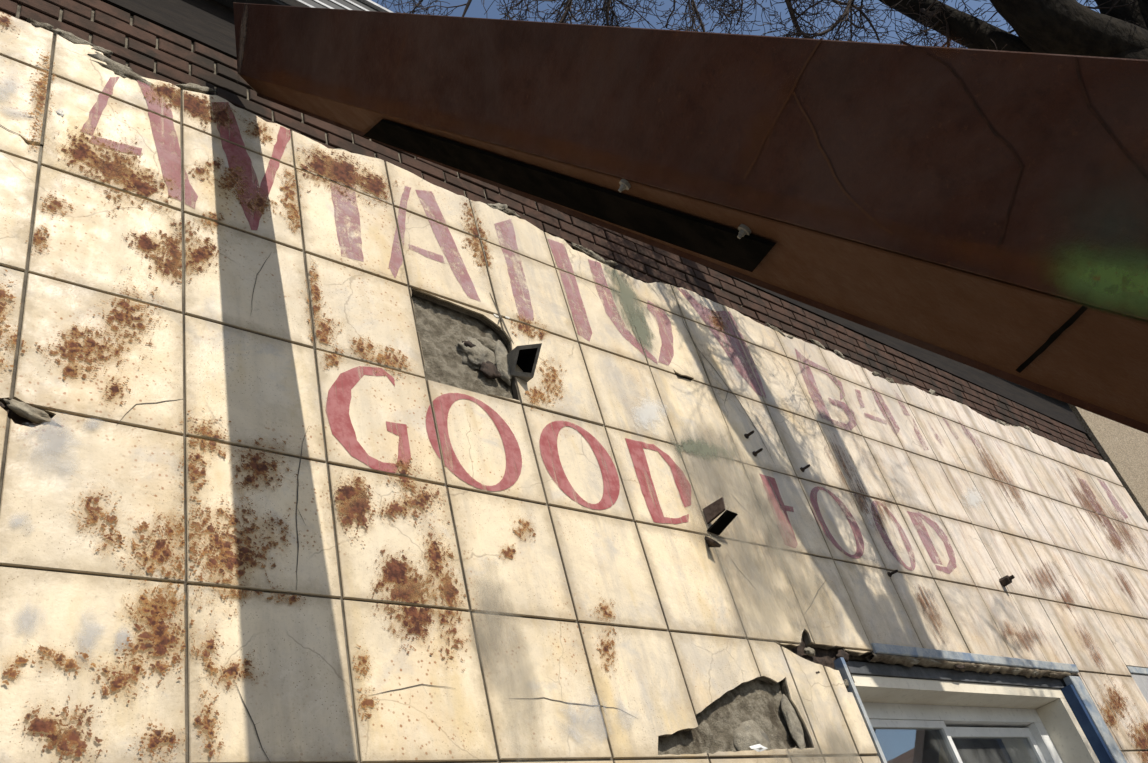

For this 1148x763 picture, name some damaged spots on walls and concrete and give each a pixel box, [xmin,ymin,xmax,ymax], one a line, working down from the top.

corrosion [0,49,412,414]
peeling [411,295,514,399]
spalling [0,398,61,427]
corrosion [2,408,320,763]
corrosion [322,454,472,671]
corrosion [1075,623,1104,666]
spalling [658,679,807,755]
corrosion [1098,677,1148,763]